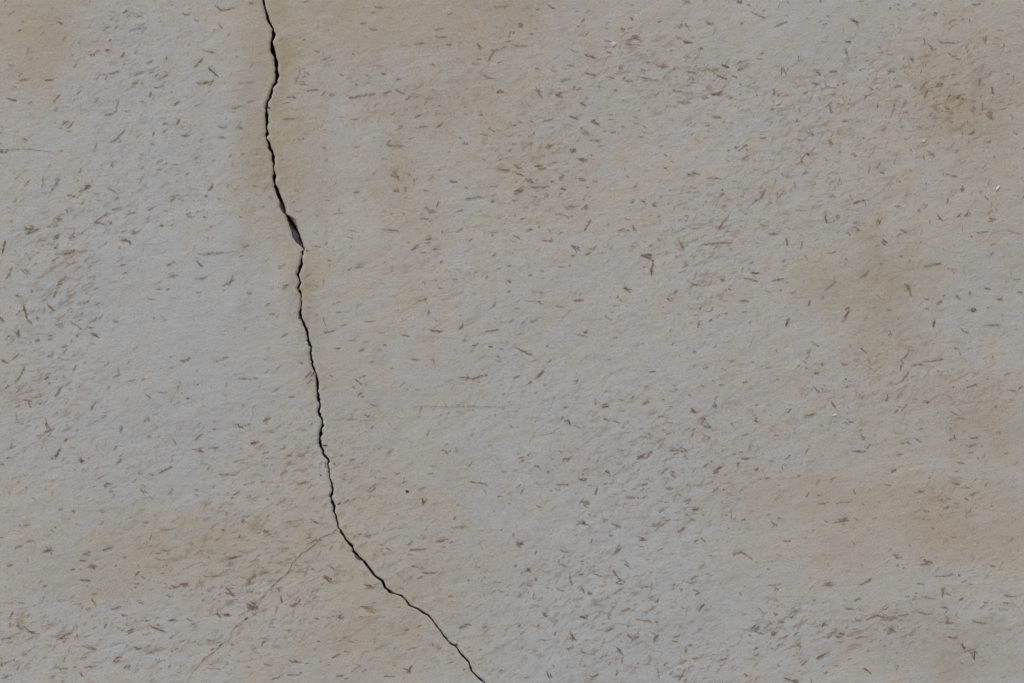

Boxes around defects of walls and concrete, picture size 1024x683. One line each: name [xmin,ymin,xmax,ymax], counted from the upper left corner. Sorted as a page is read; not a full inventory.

crack [262,0,485,683]